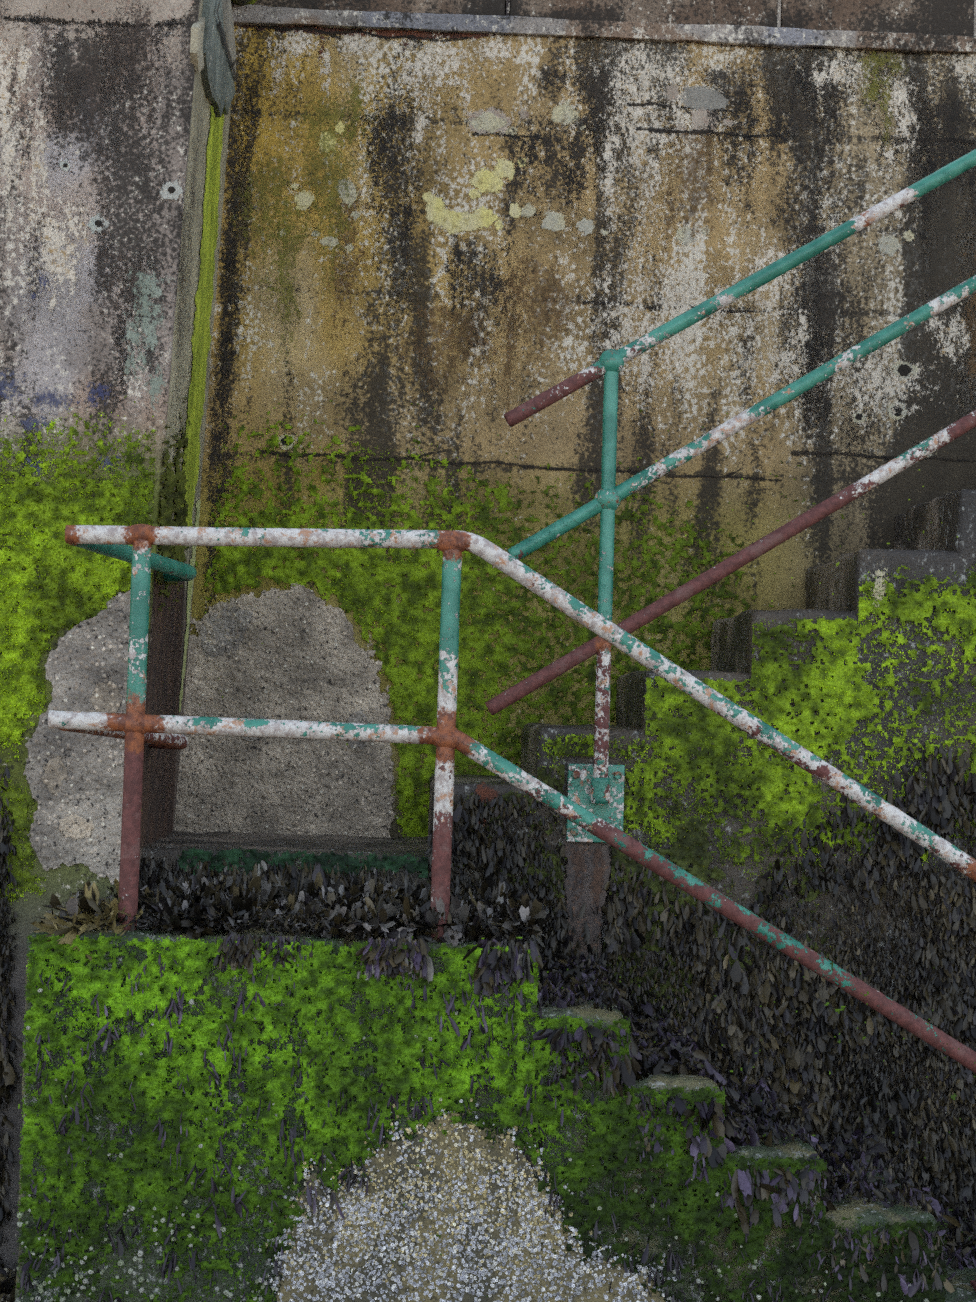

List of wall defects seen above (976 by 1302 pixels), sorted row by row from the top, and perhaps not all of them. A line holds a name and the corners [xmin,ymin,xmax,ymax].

damp [0,0,523,527]
damp [393,41,976,447]
peeling [23,589,131,885]
damp [187,546,222,614]
peeling [174,734,396,838]
peeling [183,583,391,724]